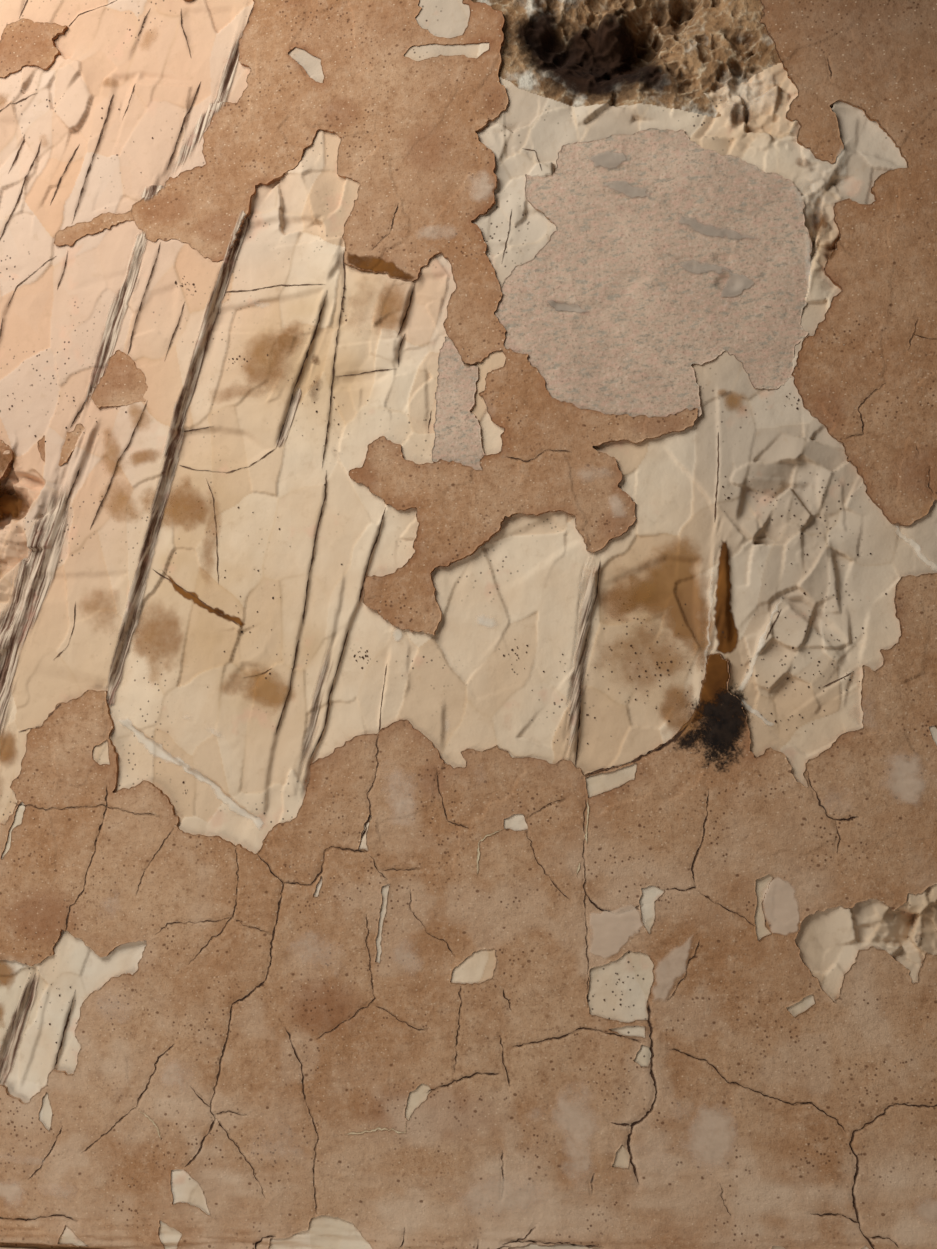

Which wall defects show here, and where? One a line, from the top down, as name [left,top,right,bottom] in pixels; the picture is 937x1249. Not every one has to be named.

spalling [0,0,937,859]
corrosion [605,542,738,728]
spalling [0,930,147,1130]
crack [16,787,171,930]
crack [159,740,452,1211]
spalling [376,884,390,963]
spalling [450,948,497,984]
spalling [639,885,665,934]
crack [428,727,937,1249]
spalling [787,884,937,1017]
crack [30,1045,173,1178]
crack [0,1213,73,1221]